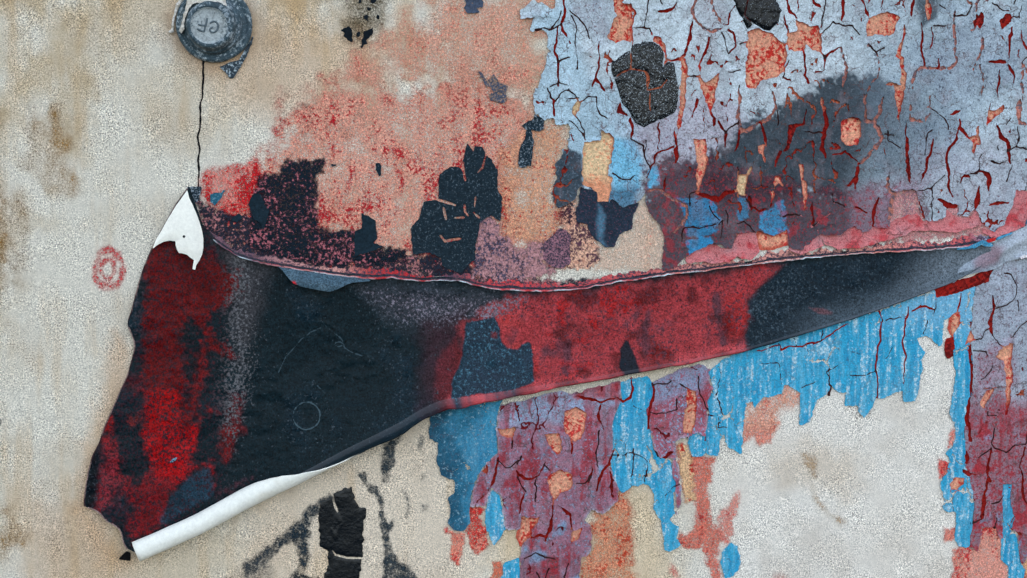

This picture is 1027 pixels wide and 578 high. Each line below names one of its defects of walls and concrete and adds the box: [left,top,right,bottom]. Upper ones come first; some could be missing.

crack [553,0,571,87]
crack [635,0,737,62]
crack [786,0,860,35]
crack [910,0,989,89]
crack [989,26,1013,97]
crack [197,61,205,186]
peeling [411,144,502,273]
crack [646,133,735,233]
peeling [518,0,1027,273]
crack [921,110,1011,210]
peeling [84,186,1027,578]
crack [577,377,656,430]